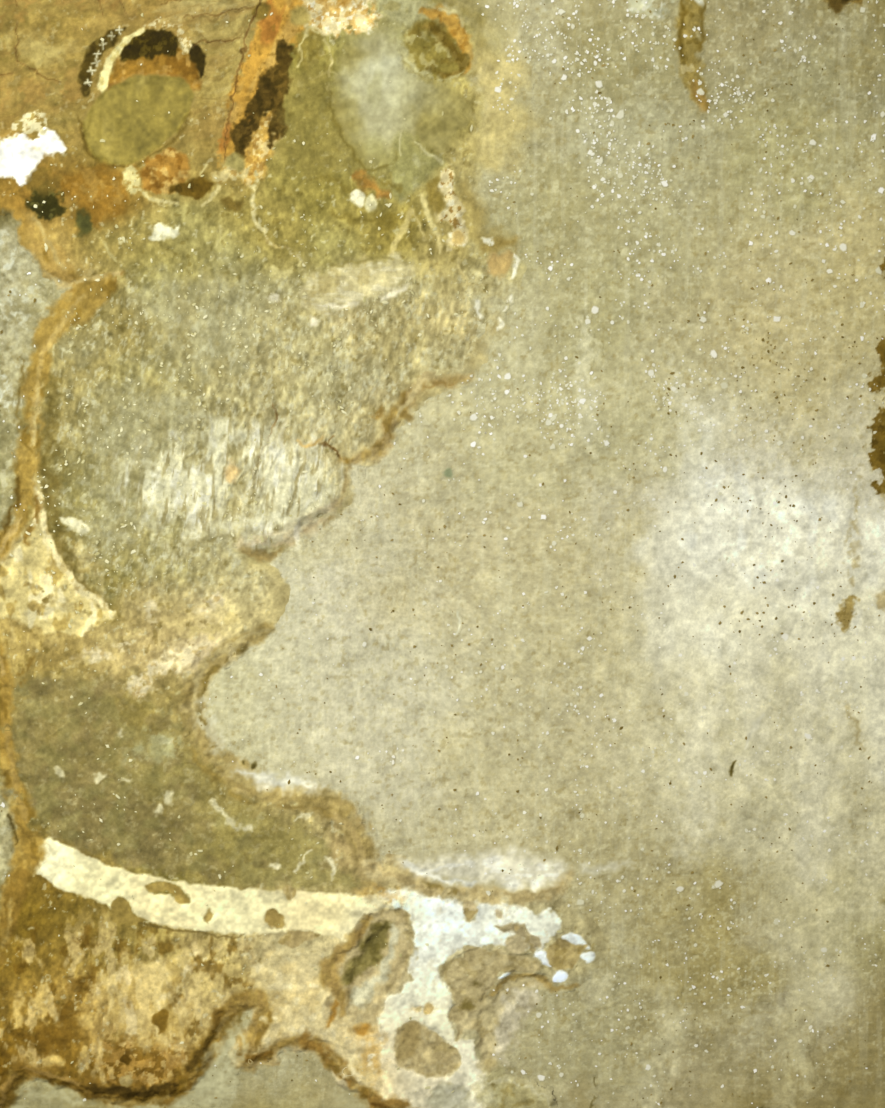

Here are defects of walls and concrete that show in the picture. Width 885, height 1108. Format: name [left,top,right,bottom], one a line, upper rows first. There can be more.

crack [0,21,63,84]
crack [160,0,262,165]
leakage [424,0,560,183]
rust [671,0,712,116]
crack [819,0,864,16]
spalling [0,207,128,574]
spalling [335,367,482,516]
spalling [0,619,590,1108]